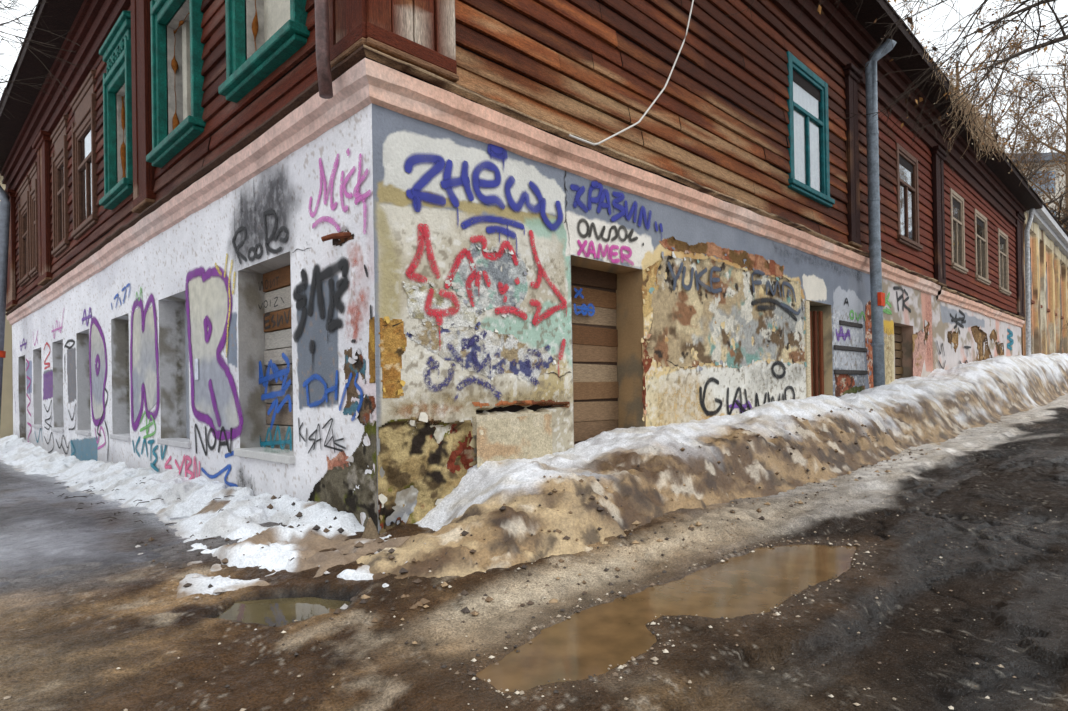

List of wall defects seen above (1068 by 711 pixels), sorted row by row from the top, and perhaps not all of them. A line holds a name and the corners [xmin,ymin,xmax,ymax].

spalling [342,242,570,534]
flaking render [641,236,807,421]
spalling [947,328,958,353]
spalling [971,325,1004,361]